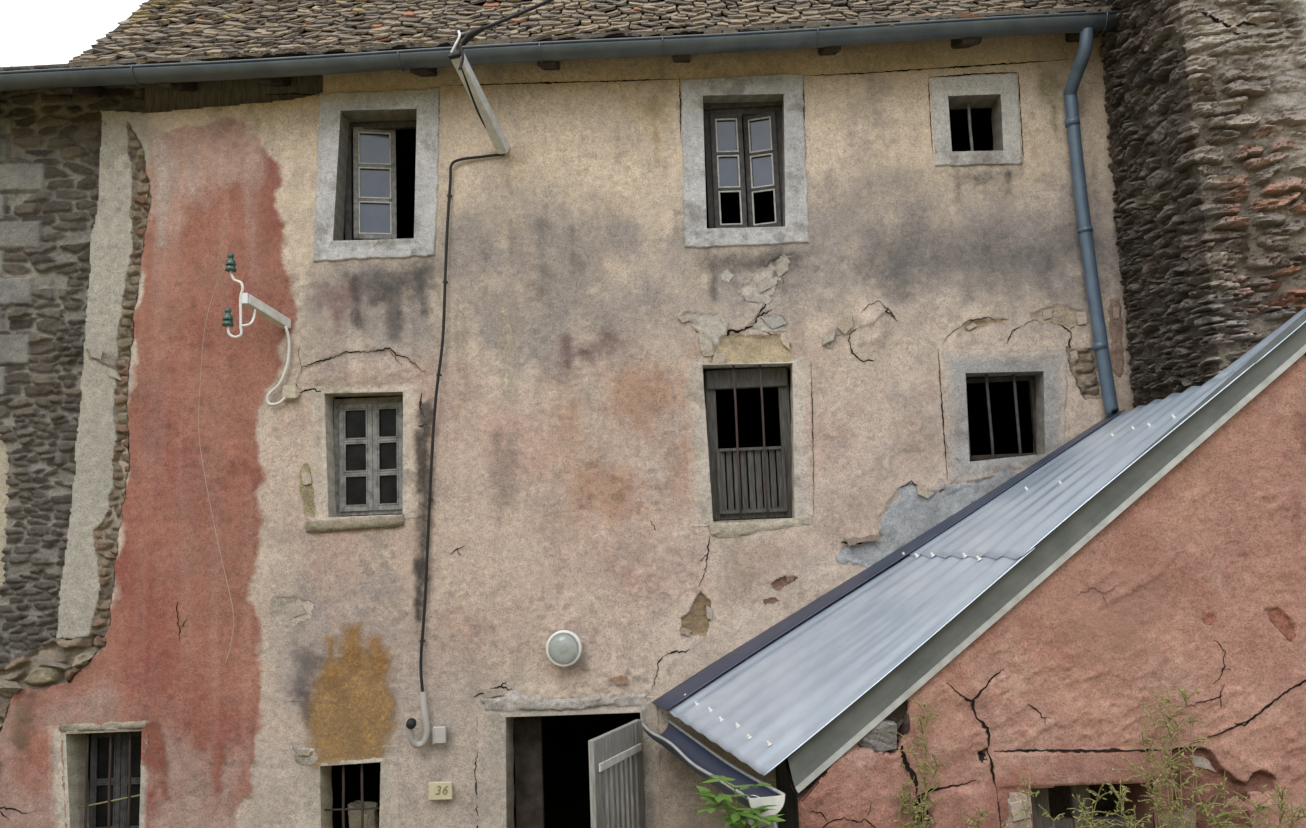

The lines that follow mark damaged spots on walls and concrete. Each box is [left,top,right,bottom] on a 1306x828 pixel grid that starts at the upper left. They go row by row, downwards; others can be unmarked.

crack [1191,12,1262,35]
leakage [347,262,431,335]
spalling [678,254,792,364]
crack [848,301,898,362]
crack [296,347,425,427]
crack [900,316,1074,492]
spalling [835,469,1016,569]
spalling [679,592,713,636]
spalling [1269,608,1296,641]
crack [652,649,689,689]
crack [897,640,1306,828]
spalling [1170,746,1276,828]